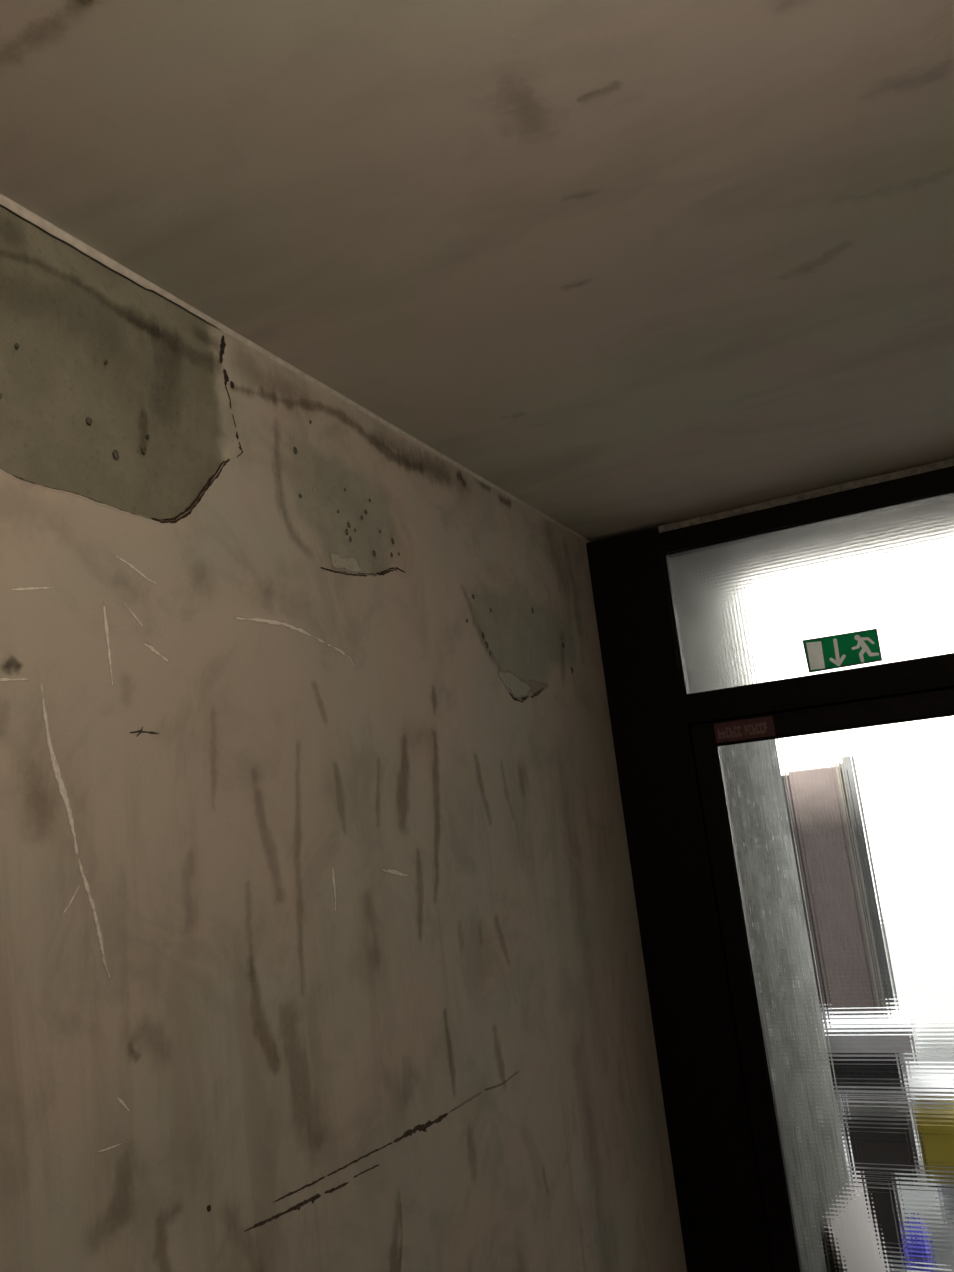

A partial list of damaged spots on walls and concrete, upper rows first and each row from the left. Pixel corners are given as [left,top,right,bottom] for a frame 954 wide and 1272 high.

flaking render [0,204,239,524]